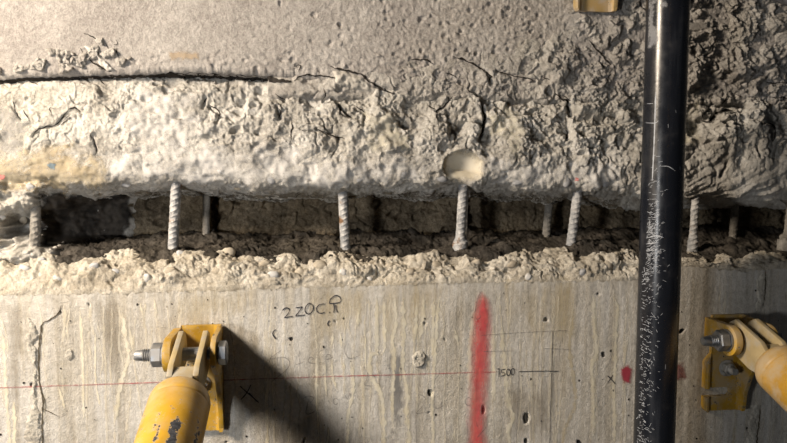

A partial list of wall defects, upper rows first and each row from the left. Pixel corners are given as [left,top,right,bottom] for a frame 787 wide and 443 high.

crack [0,33,393,137]
crack [411,56,571,141]
crack [589,40,611,83]
crack [700,92,742,123]
crack [748,119,776,160]
spalling [0,182,639,296]
spalling [681,250,787,273]
leakage [1,324,17,443]
crack [37,306,61,443]
leakage [62,300,161,443]
leakage [315,299,445,443]
leakage [491,296,555,443]